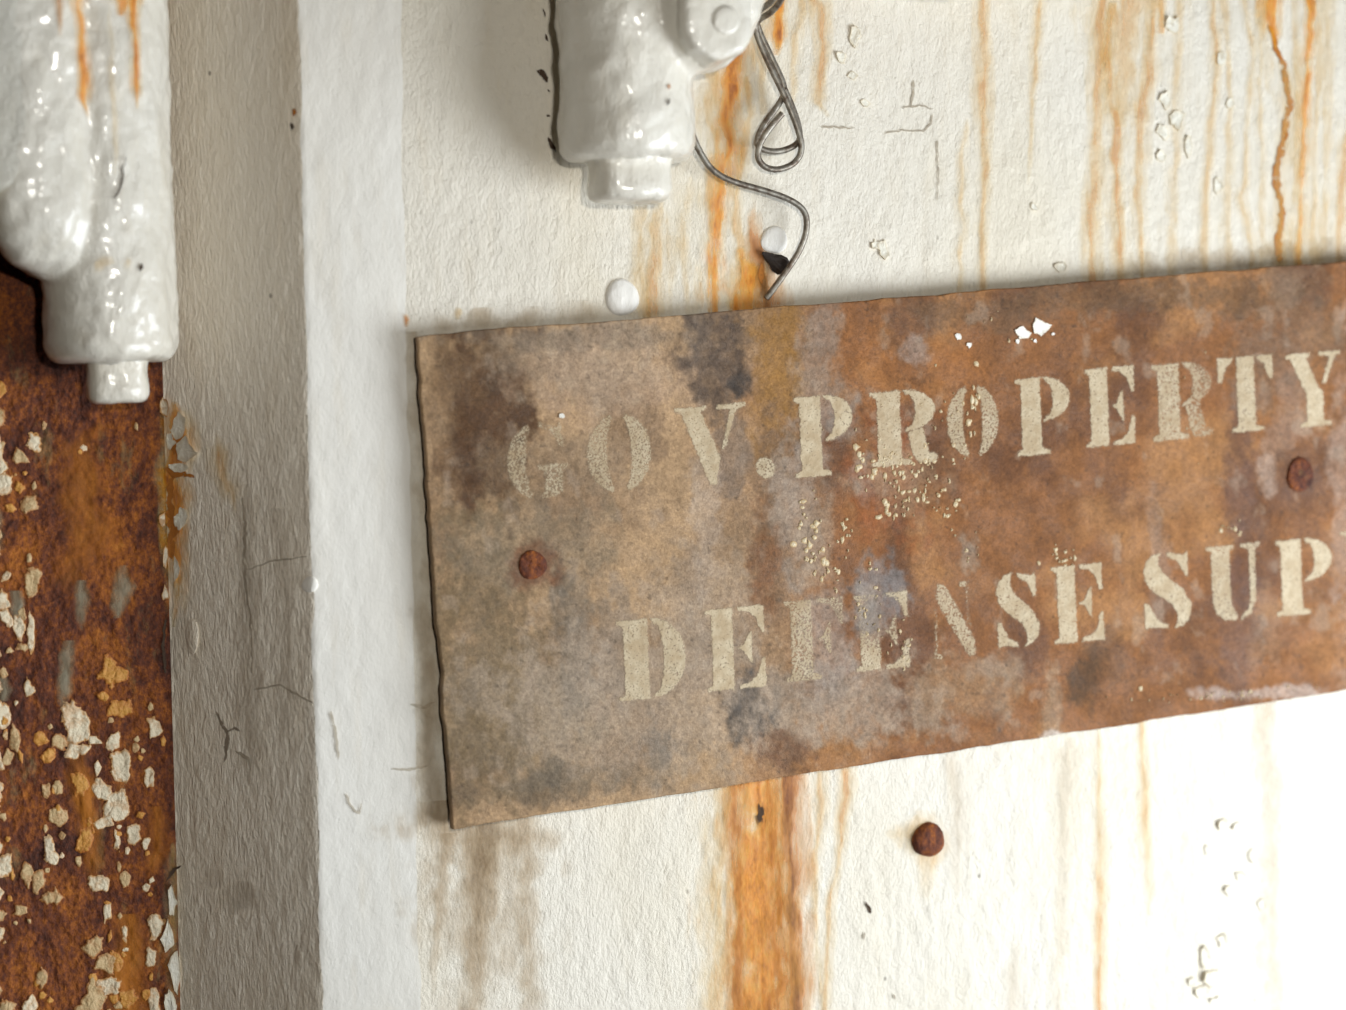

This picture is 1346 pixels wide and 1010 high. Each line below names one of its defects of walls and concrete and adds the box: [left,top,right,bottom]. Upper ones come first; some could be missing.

corrosion [1266,0,1277,43]
corrosion [1300,0,1316,177]
corrosion [708,53,780,312]
peeling [0,380,47,555]
peeling [159,507,188,530]
corrosion [163,408,186,586]
peeling [160,397,197,472]
corrosion [75,770,97,828]
peeling [0,545,181,1010]
corrosion [114,914,140,1010]
damp [466,821,501,918]
corrosion [728,774,805,1010]